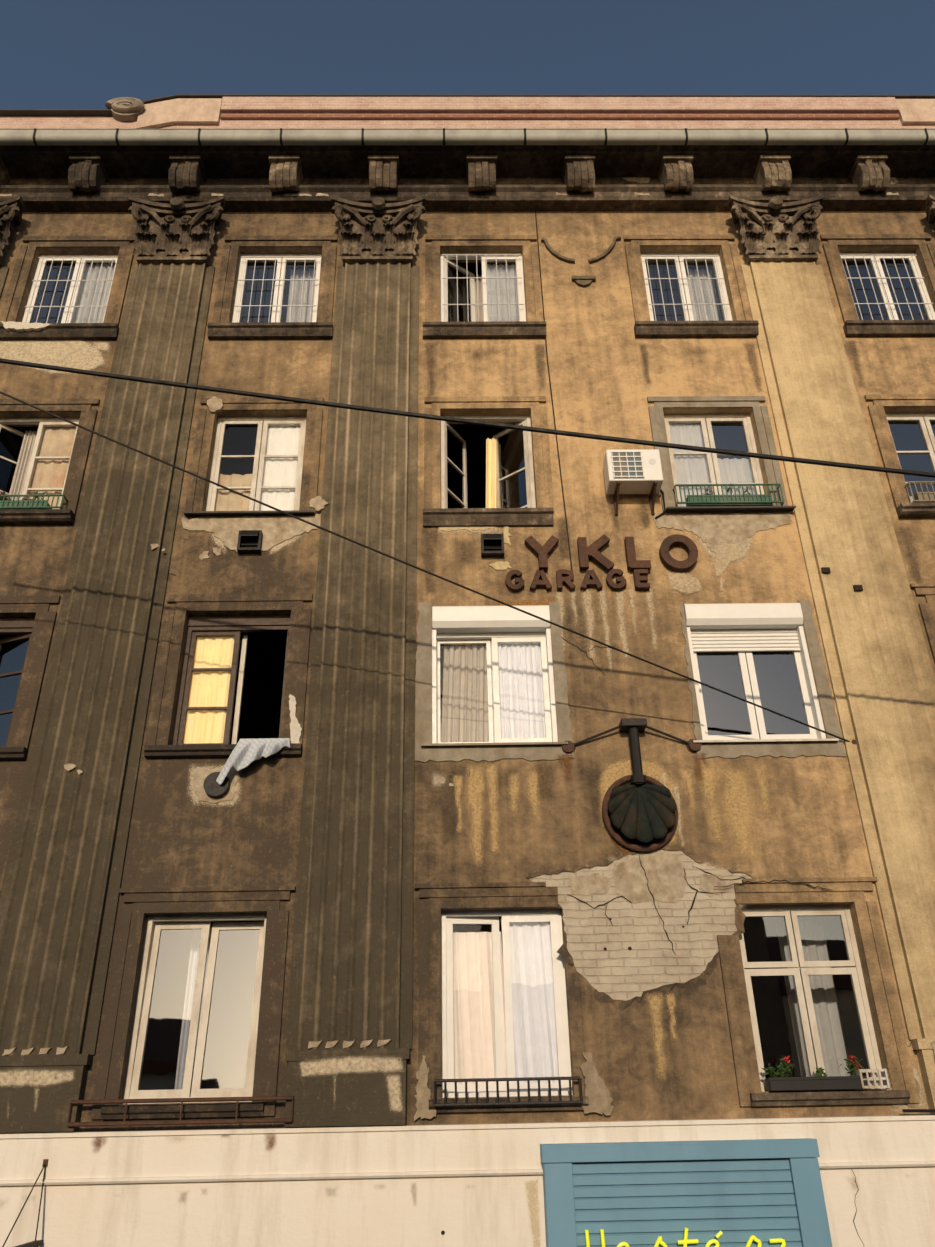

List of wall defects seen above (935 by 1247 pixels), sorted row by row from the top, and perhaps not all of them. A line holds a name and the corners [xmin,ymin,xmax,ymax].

peeling [0,321,109,374]
spalling [207,396,223,414]
spalling [181,496,329,560]
peeling [668,572,700,593]
damp [557,589,656,670]
damp [599,759,768,857]
spalling [526,842,762,1011]
crack [567,856,832,955]